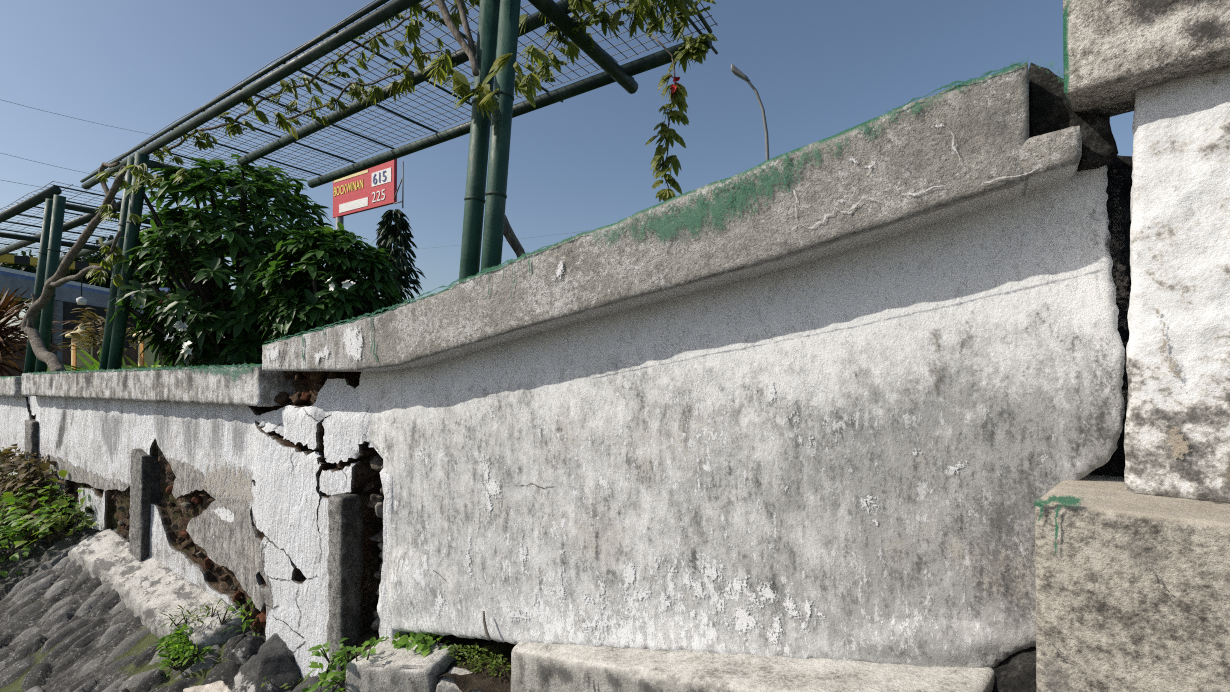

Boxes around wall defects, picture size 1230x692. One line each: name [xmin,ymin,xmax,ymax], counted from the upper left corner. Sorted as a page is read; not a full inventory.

spalling [44,452,130,540]
spalling [150,439,273,636]
spalling [248,325,363,416]
crack [250,410,379,653]
spalling [351,450,384,635]
crack [529,132,1042,326]
leakage [975,482,1062,624]
leakage [1068,400,1114,468]
crack [1088,155,1133,477]